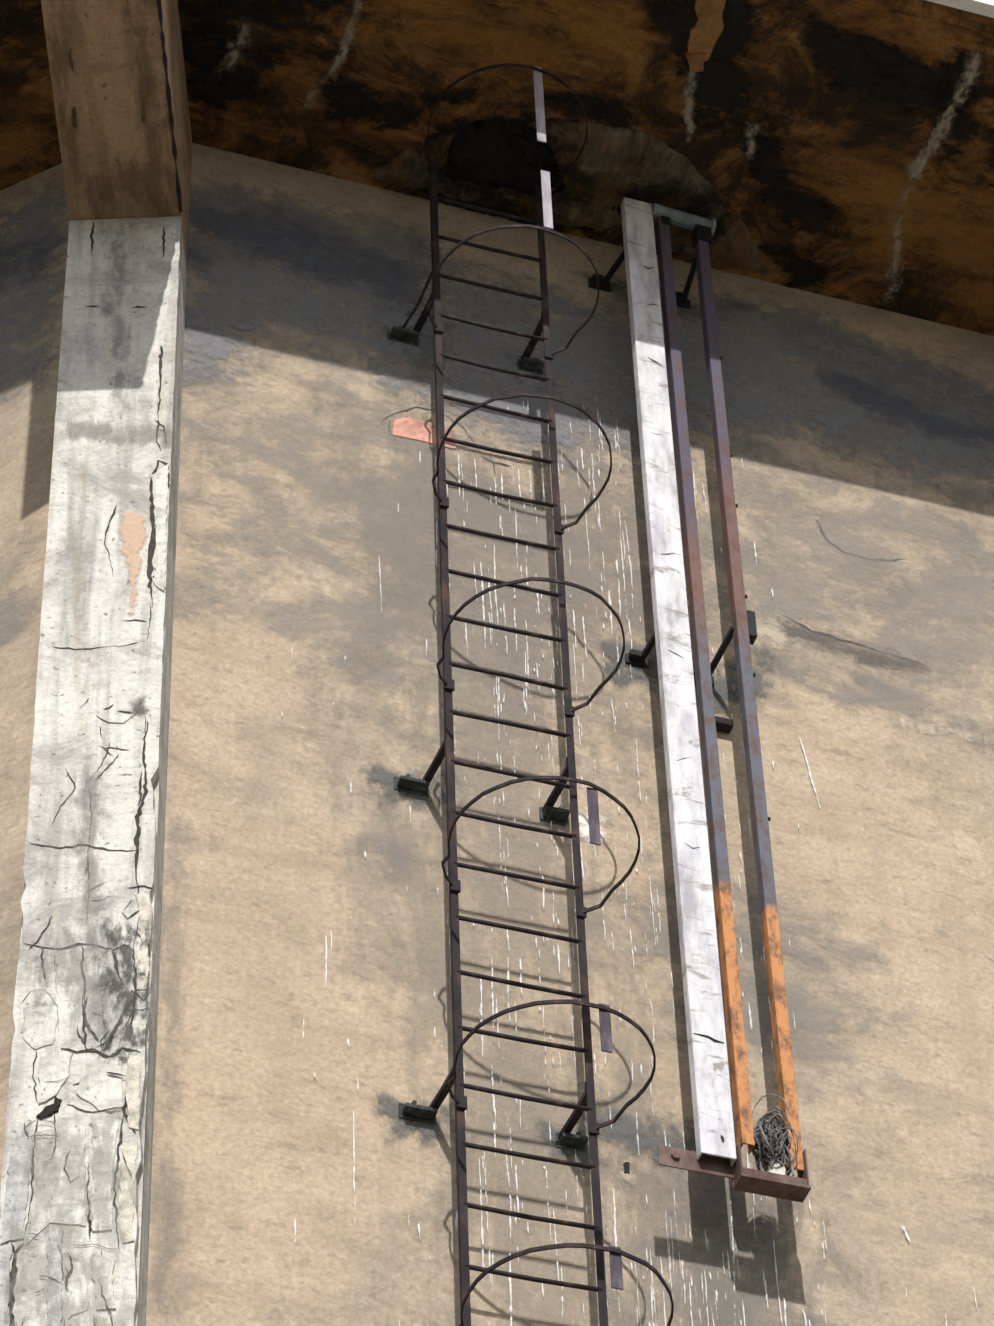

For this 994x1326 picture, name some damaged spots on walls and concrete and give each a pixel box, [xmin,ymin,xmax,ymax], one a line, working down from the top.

damp [178,0,477,195]
damp [544,0,903,294]
peeling [104,464,170,622]
flaking render [388,417,457,450]
damp [661,298,994,744]
crack [7,698,153,1326]
damp [531,869,574,988]
damp [602,733,681,965]
damp [740,975,776,1077]
peeling [0,997,142,1326]
damp [541,981,696,1314]
damp [631,1177,787,1326]